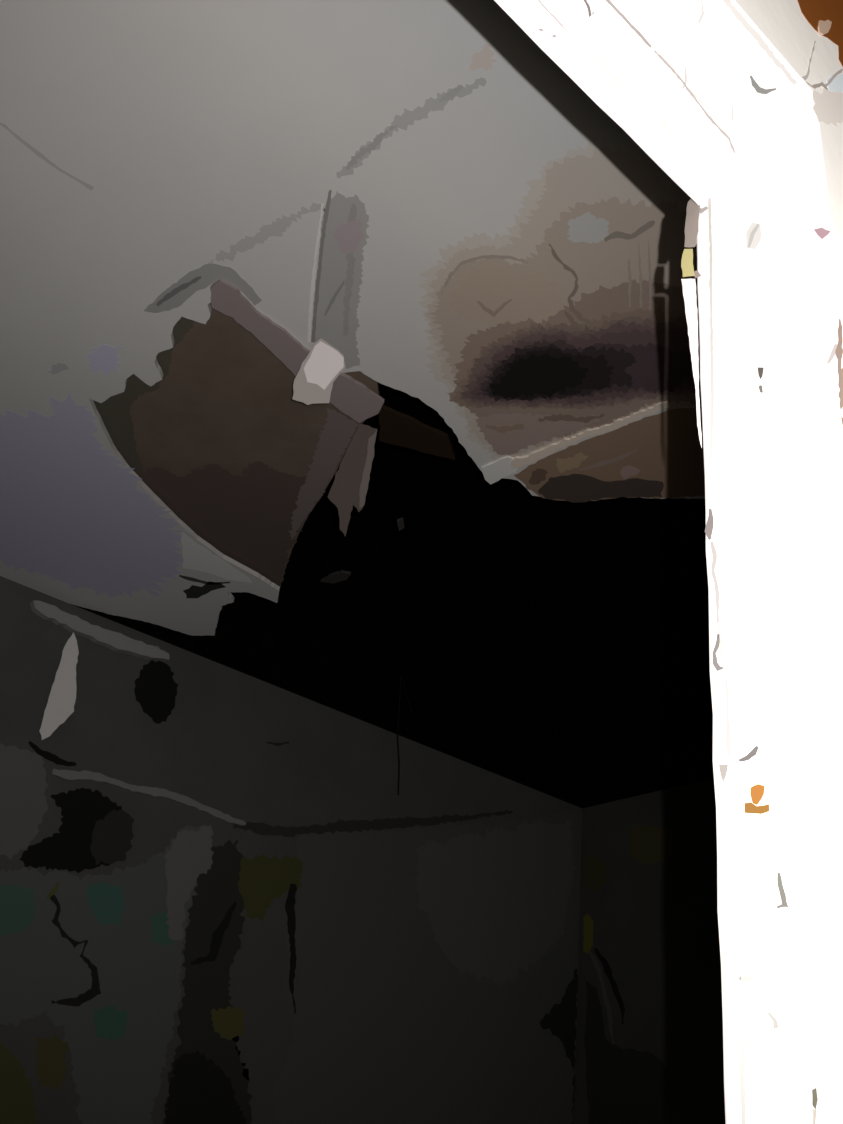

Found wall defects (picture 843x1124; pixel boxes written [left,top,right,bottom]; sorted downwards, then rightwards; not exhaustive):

peeling [798,0,843,66]
water stain [419,135,702,461]
water stain [538,474,664,503]
rust [745,784,769,814]